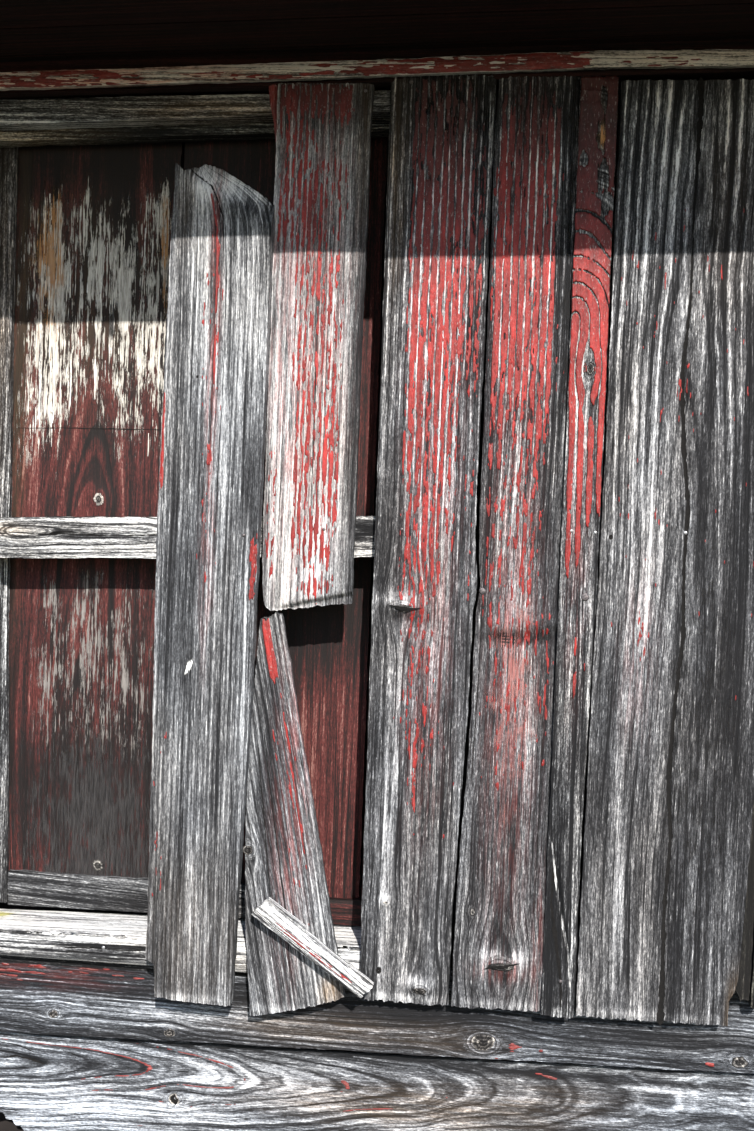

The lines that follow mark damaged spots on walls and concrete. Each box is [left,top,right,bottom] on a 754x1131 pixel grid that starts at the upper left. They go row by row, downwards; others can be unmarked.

peeling [0,70,147,88]
peeling [17,176,171,489]
peeling [182,52,632,813]
peeling [31,569,148,753]
peeling [262,618,307,888]
crack [471,601,483,779]